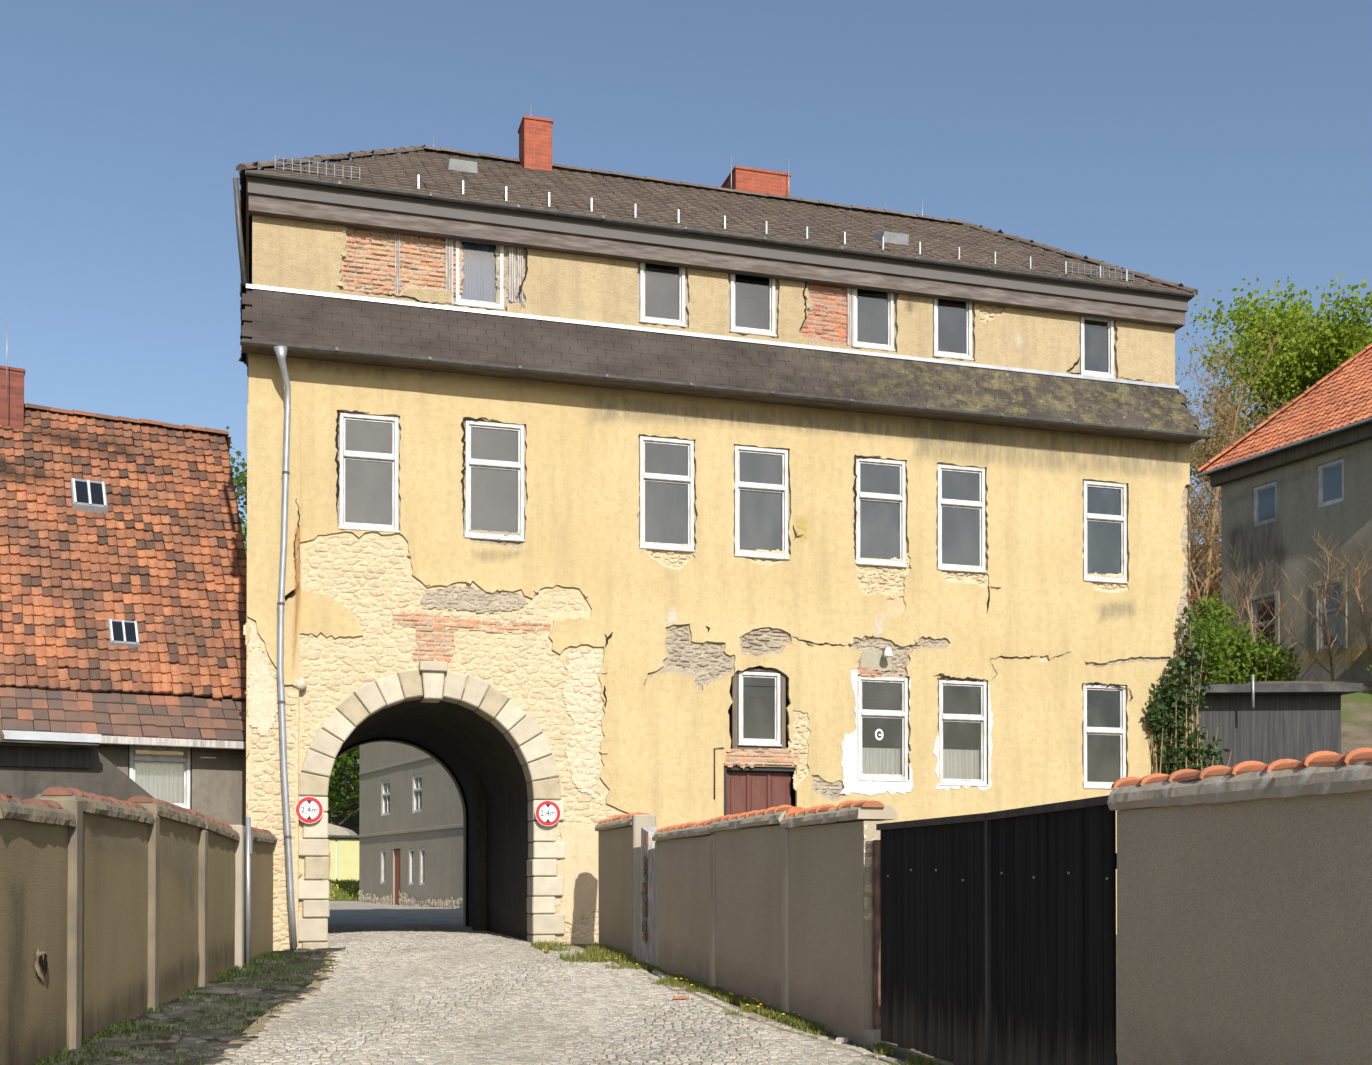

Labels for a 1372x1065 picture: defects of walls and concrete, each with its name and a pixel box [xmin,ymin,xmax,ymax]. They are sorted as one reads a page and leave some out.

flaking render [337,226,464,296]
flaking render [798,282,857,348]
flaking render [463,529,525,548]
flaking render [646,543,695,570]
flaking render [855,553,911,618]
flaking render [647,624,791,692]
crack [795,637,845,646]
crack [935,651,1072,681]
crack [1083,682,1133,700]
flaking render [243,532,628,951]